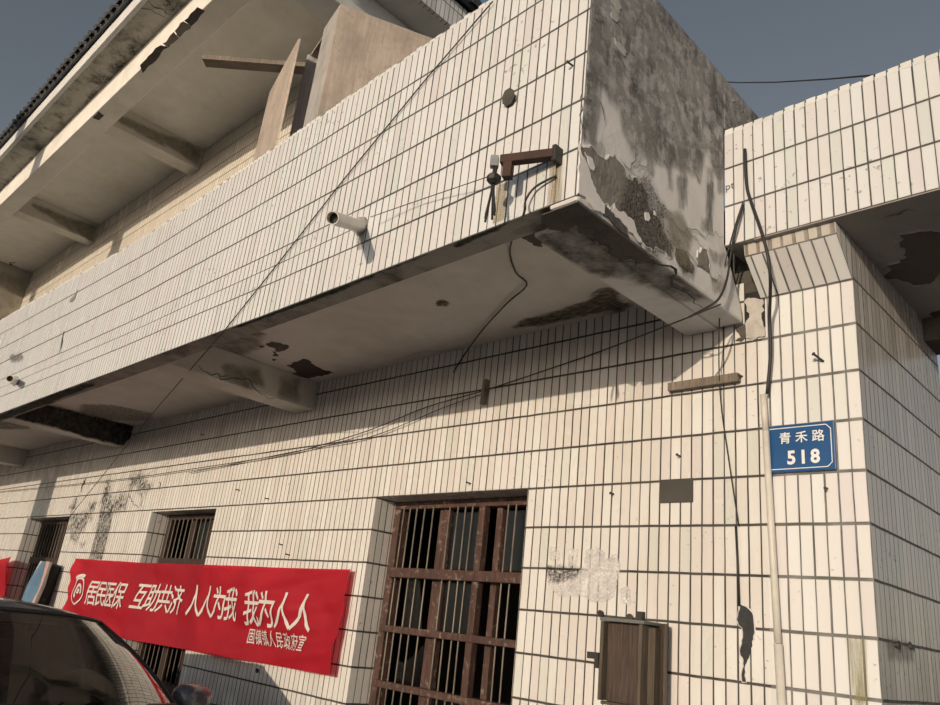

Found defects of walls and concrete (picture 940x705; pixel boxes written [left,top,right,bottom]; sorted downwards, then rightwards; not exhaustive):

spalling [140,7,205,73]
damp [582,0,758,175]
crack [621,152,647,177]
spalling [540,143,710,274]
crack [591,206,724,308]
peeling [881,228,940,287]
peeling [259,342,336,379]
spalling [735,324,746,342]
damp [90,483,124,560]
spalling [736,603,756,683]